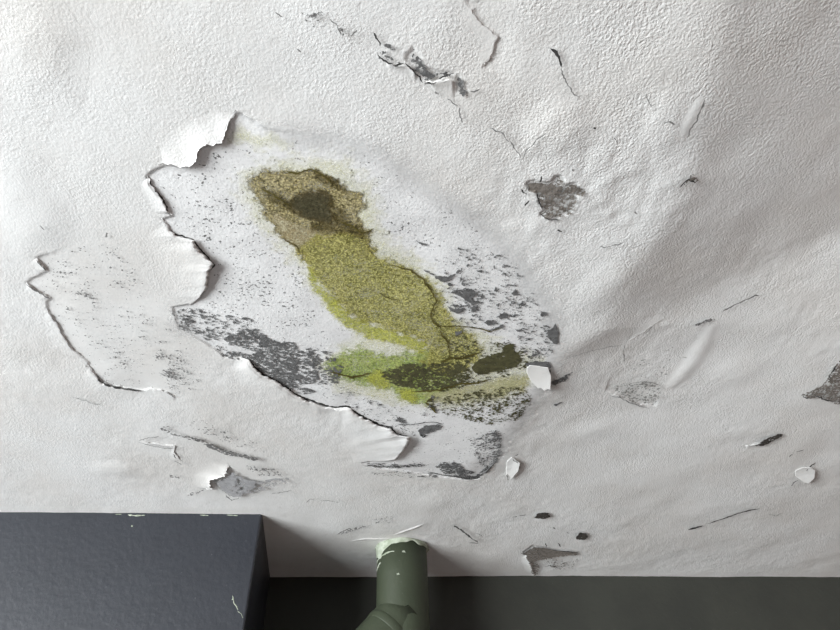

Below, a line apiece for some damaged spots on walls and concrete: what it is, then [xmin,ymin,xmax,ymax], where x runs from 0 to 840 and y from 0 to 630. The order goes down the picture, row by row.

peeling [374,33,479,106]
crack [551,49,579,97]
peeling [521,176,586,232]
peeling [25,110,573,480]
water stain [247,169,528,406]
crack [385,264,501,360]
peeling [609,314,719,410]
peeling [802,361,840,404]
peeling [745,434,783,451]
peeling [188,461,289,501]
peeling [791,463,815,486]
peeling [520,543,578,577]